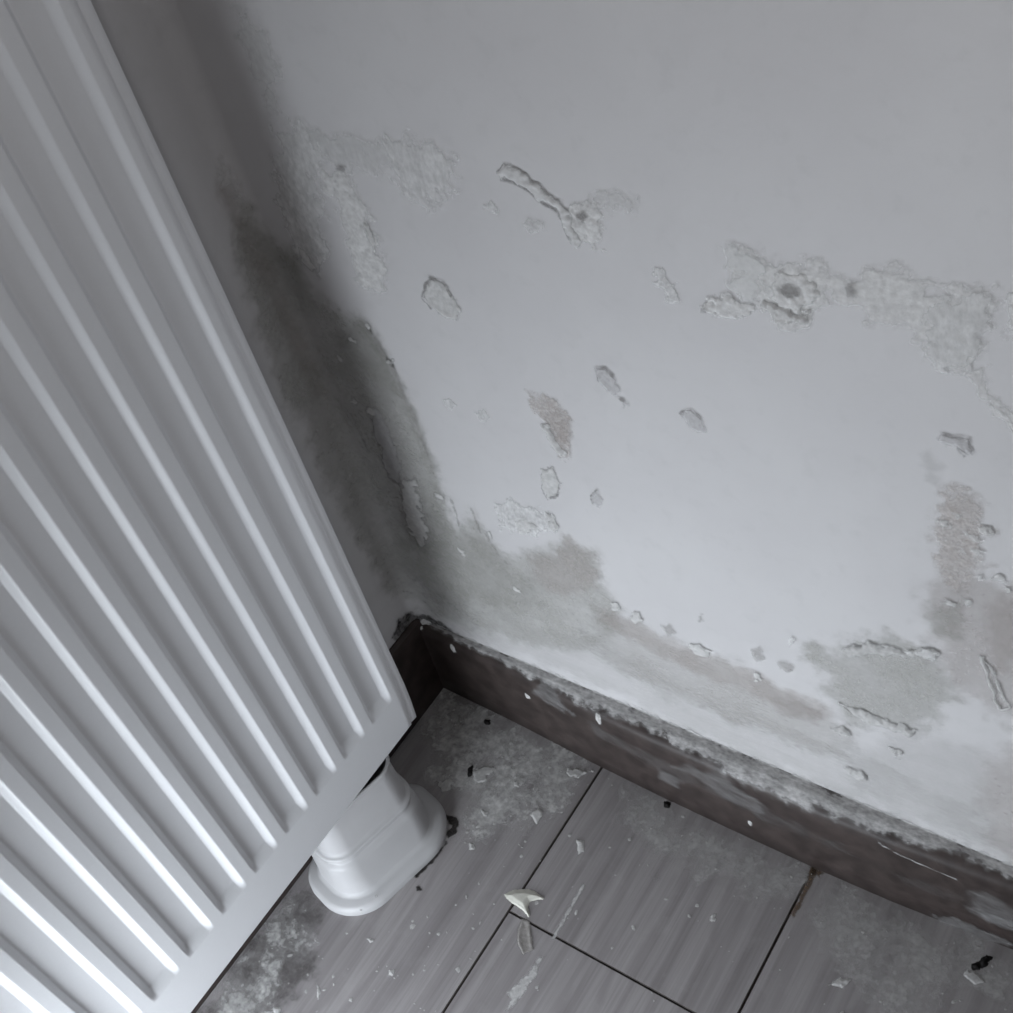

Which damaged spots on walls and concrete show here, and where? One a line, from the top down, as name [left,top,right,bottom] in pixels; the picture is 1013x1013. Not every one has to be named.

damp [334,355,443,547]
damp [392,613,450,641]
peeling [473,766,495,783]
peeling [530,808,543,824]